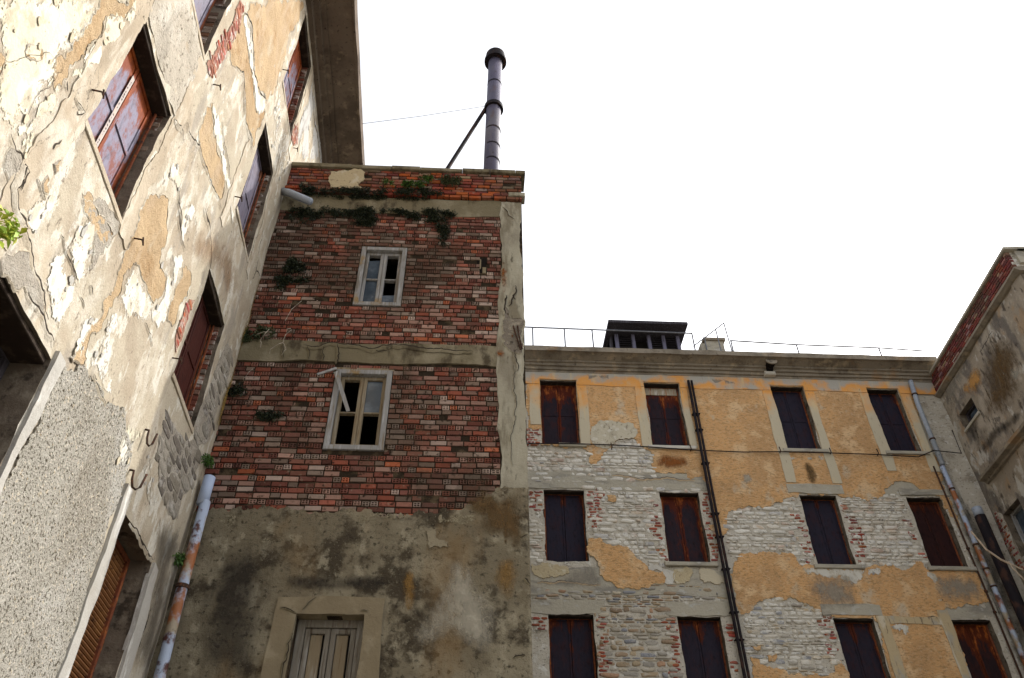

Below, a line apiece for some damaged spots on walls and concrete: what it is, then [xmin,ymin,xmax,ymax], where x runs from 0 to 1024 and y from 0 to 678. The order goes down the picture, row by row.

peeling [0,0,136,189]
spalling [207,0,322,180]
spalling [198,102,236,226]
spalling [70,163,197,393]
crack [501,285,517,314]
crack [509,352,519,466]
damp [986,344,1017,411]
damp [472,494,520,543]
flaking render [527,428,938,584]
damp [212,560,255,661]
damp [424,565,488,641]
flaking render [724,597,844,678]